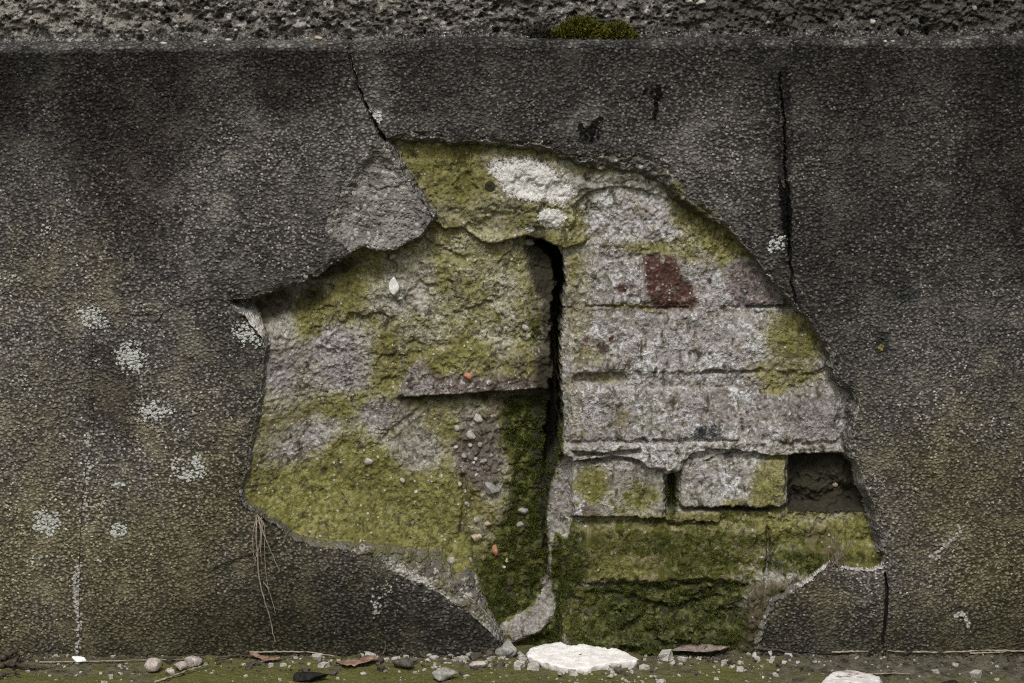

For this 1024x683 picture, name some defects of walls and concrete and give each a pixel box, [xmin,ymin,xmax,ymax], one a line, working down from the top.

crack [349,46,386,141]
crack [777,72,797,303]
spalling [229,131,887,657]
crack [881,572,889,645]